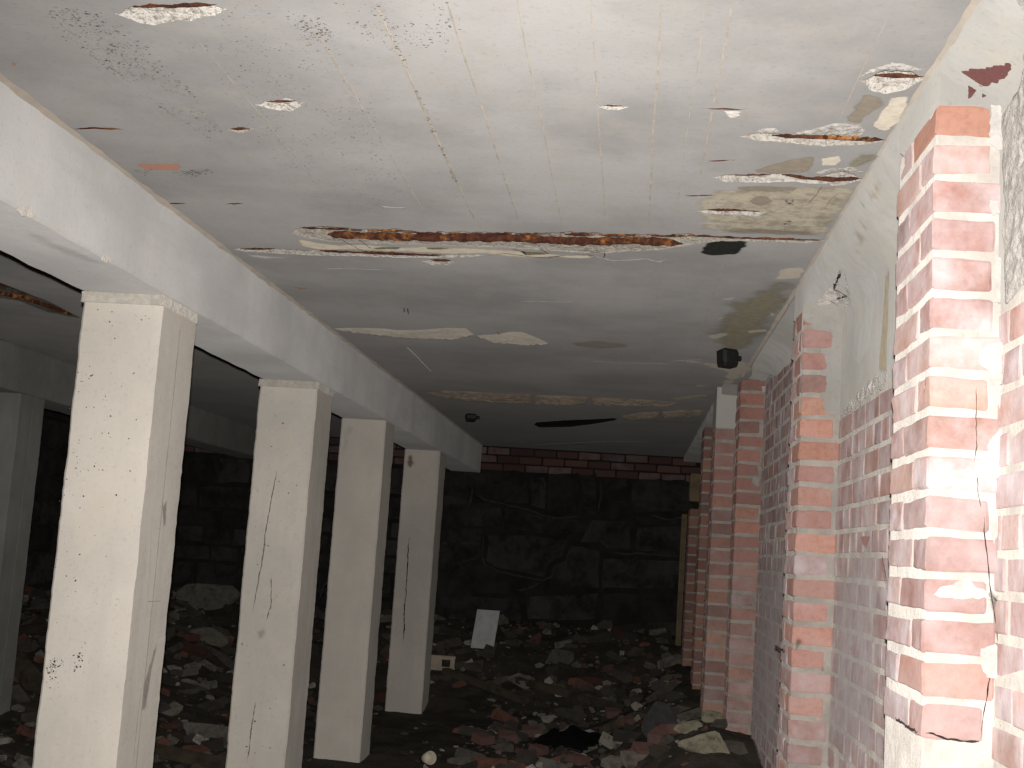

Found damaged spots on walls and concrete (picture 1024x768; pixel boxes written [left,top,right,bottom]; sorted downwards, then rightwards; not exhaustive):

spalling [48,2,401,210]
spalling [740,123,886,147]
spalling [858,62,926,94]
flaking render [962,63,1011,98]
spalling [713,167,864,186]
spalling [234,220,824,266]
damp [702,186,850,255]
crack [831,271,851,304]
crack [253,473,277,620]
crack [974,394,998,643]
crack [402,543,410,642]
crack [895,678,990,743]